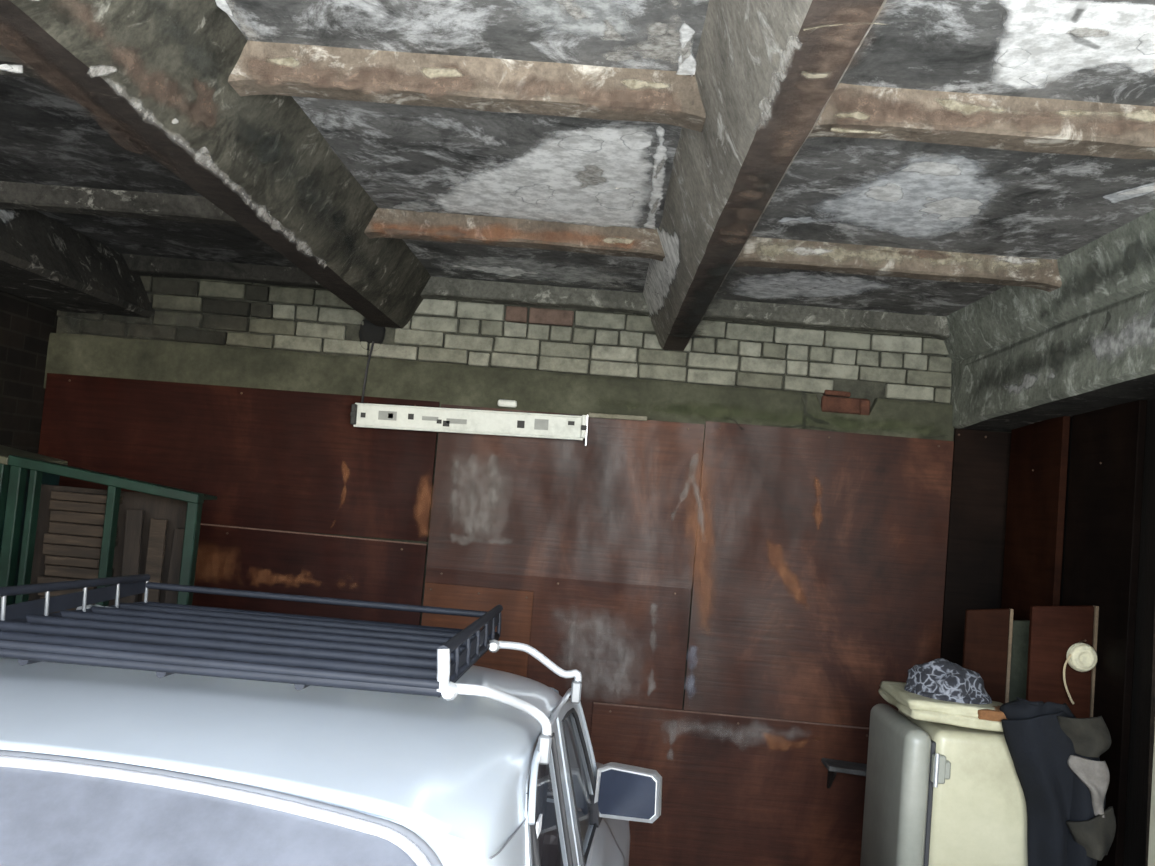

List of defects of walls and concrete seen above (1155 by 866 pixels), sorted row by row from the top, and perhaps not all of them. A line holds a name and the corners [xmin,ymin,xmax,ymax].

water stain [778,156,997,237]
flaking render [0,210,14,222]
water stain [758,244,1044,270]